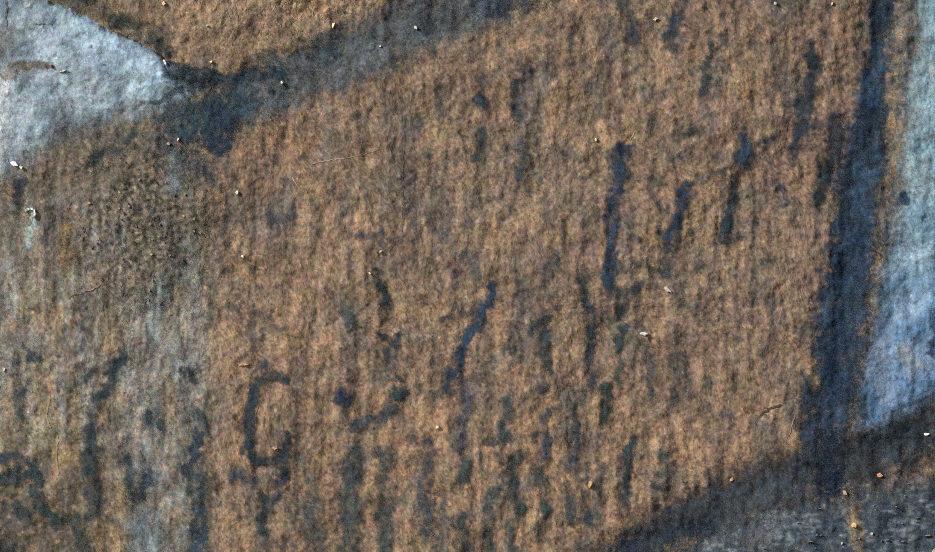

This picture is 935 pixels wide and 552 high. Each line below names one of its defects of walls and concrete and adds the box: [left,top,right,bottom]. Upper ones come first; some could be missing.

damp [71,0,139,30]
efflorescence [0,64,11,167]
damp [90,133,135,166]
damp [153,0,527,194]
damp [12,178,38,250]
efflorescence [145,226,190,345]
damp [598,0,935,552]
damp [563,277,628,527]
efflorescence [133,510,190,552]
damp [336,444,363,552]
damp [374,447,388,488]
damp [375,501,392,552]